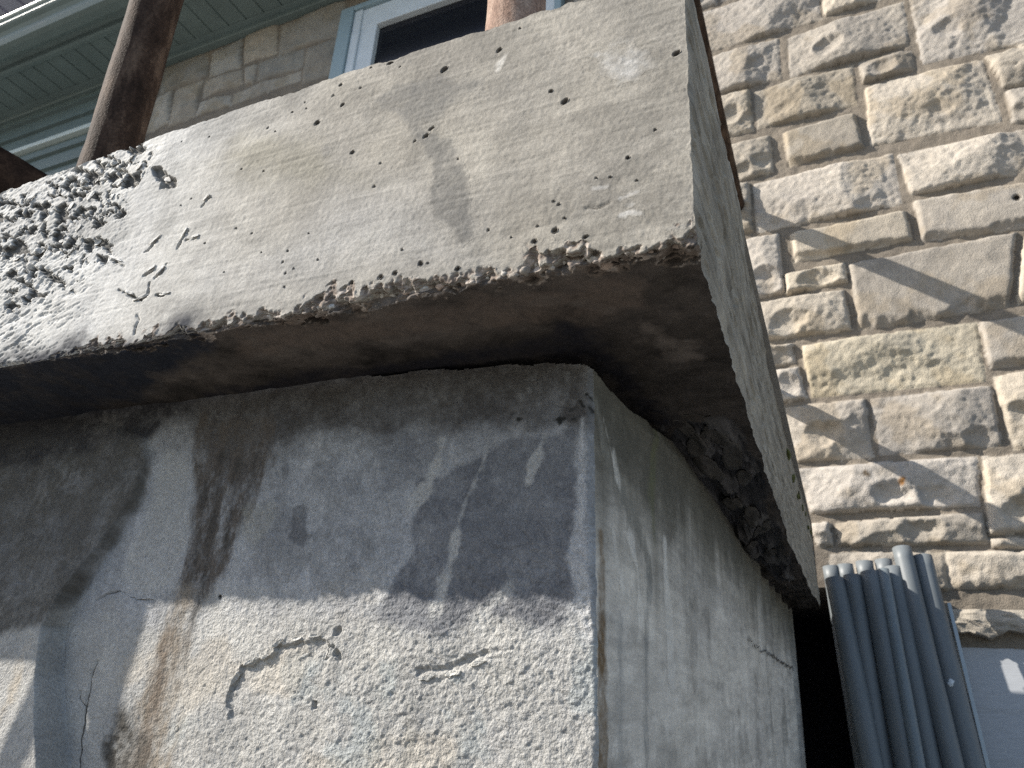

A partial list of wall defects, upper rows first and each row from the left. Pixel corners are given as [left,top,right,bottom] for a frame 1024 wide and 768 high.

spalling [0,143,177,320]
spalling [48,212,701,360]
water stain [360,51,510,248]
water stain [0,271,789,768]
spalling [650,414,797,583]
crack [79,663,98,767]